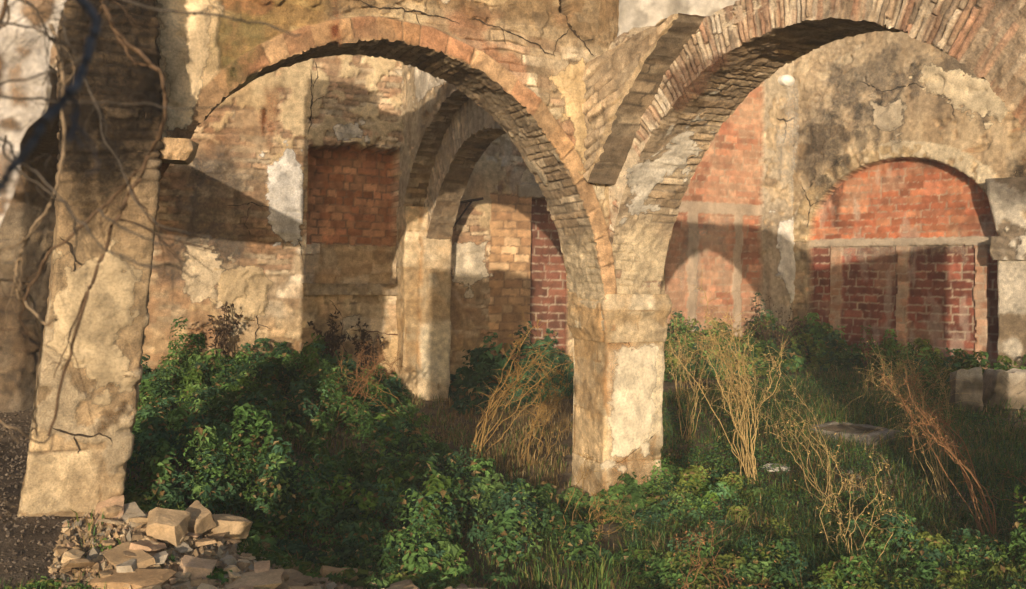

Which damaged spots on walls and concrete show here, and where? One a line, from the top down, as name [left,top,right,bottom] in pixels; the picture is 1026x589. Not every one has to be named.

crack [358,0,594,58]
peeling [260,140,304,246]
peeling [769,211,796,304]